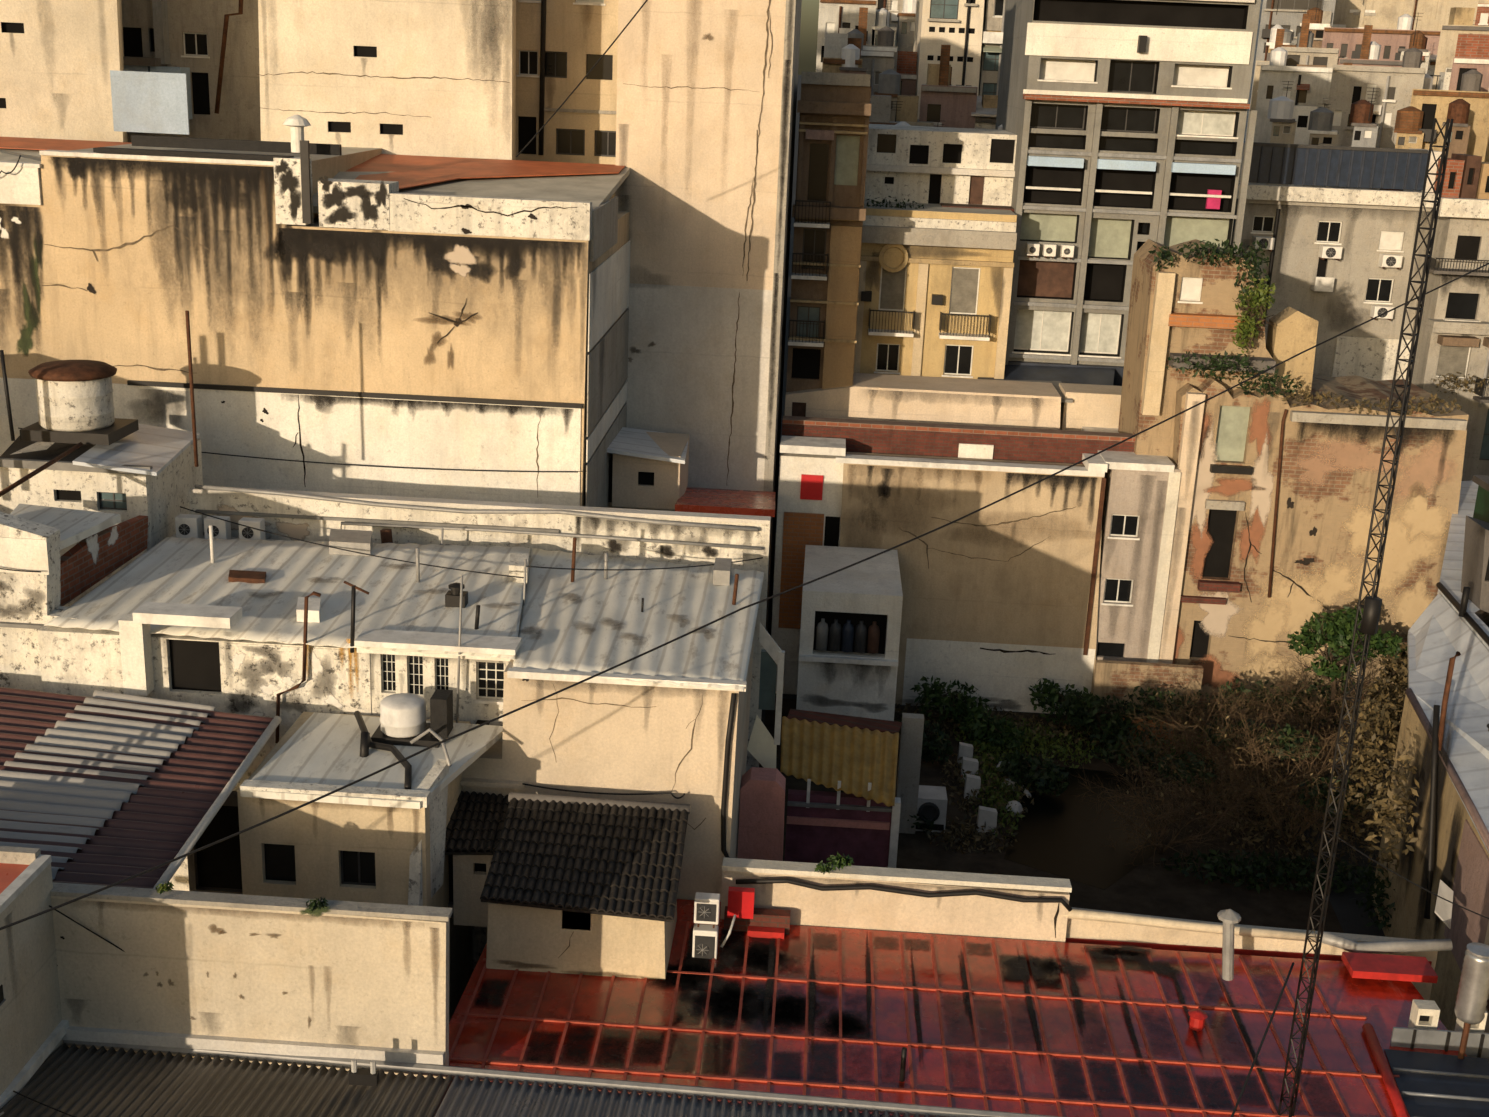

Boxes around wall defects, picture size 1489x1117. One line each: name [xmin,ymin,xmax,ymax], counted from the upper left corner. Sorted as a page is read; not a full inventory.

water stain [780,6,792,220]
peeling [0,217,21,238]
water stain [53,157,581,324]
spalling [445,228,476,277]
crack [623,0,773,478]
water stain [770,273,778,412]
spalling [1189,399,1274,579]
peeling [1312,507,1381,607]
spalling [1298,441,1454,540]
water stain [1398,721,1460,939]
water stain [526,926,928,1081]
water stain [946,944,1340,1113]